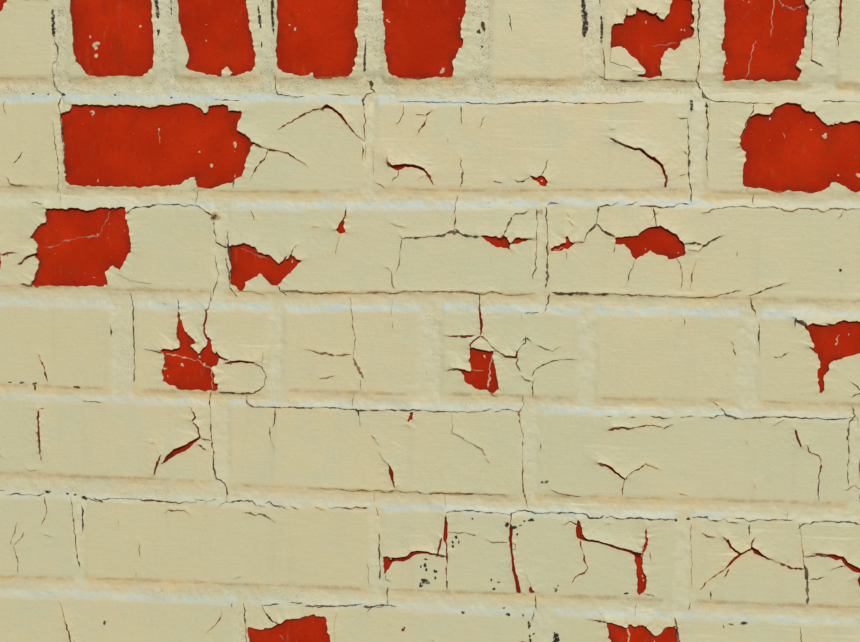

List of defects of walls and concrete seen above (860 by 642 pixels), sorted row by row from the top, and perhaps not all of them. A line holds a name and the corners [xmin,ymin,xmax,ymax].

peeling [70,0,154,77]
peeling [178,0,256,77]
peeling [382,0,466,80]
peeling [721,0,809,82]
peeling [61,103,255,189]
crack [233,77,434,188]
crack [398,100,642,133]
crack [566,0,854,260]
peeling [740,103,860,193]
peeling [31,207,131,288]
crack [608,383,860,501]
crack [674,509,860,642]